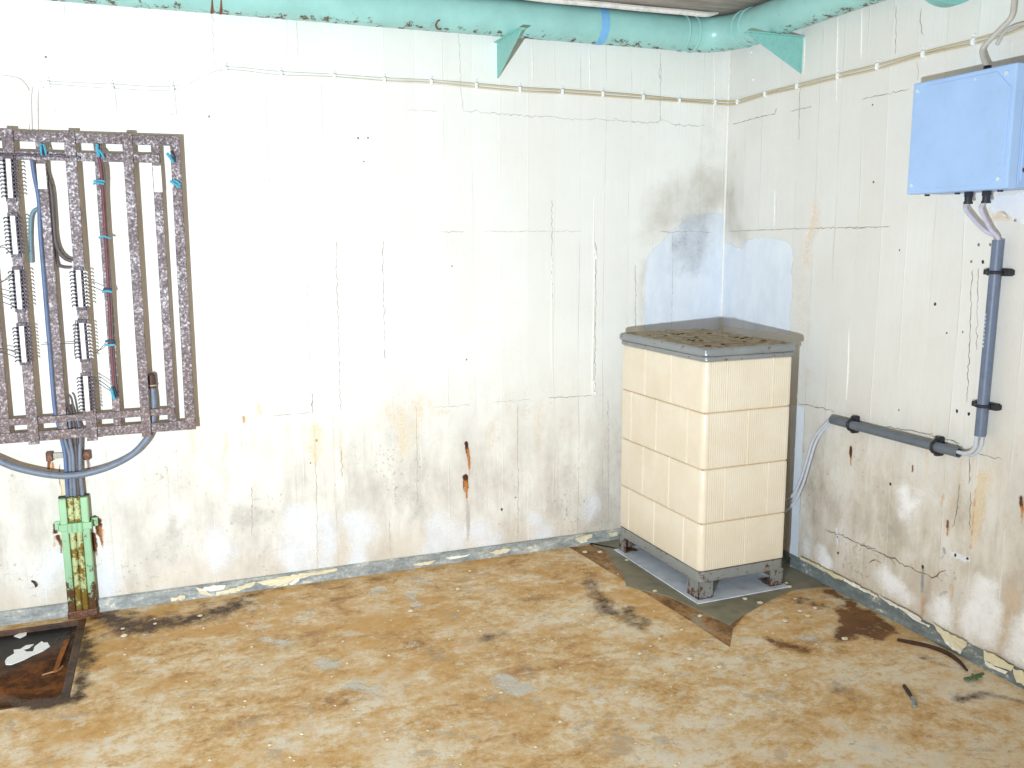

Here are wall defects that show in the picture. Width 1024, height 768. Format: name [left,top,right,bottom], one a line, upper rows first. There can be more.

crack [458,34,704,127]
crack [829,531,946,578]
peeling [196,568,337,597]
peeling [800,557,967,654]
efflorescence [883,570,909,601]
efflorescence [935,598,950,624]
leakage [962,578,1024,663]
peeling [984,650,1024,685]